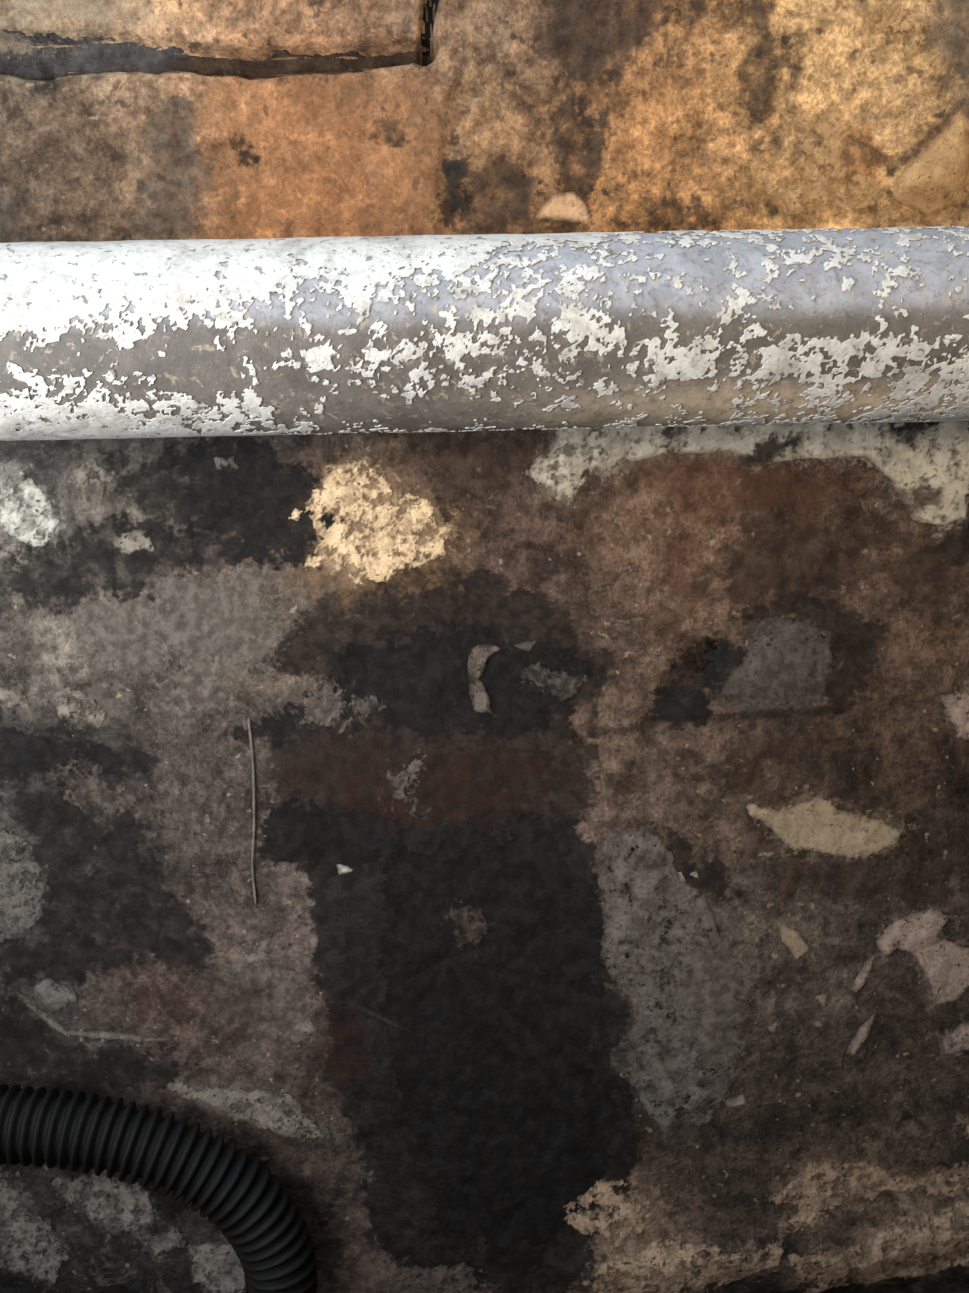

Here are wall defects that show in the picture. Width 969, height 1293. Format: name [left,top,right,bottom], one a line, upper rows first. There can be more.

spalling [864,6,924,57]
peeling [0,105,969,545]
peeling [289,459,456,593]
peeling [69,532,285,730]
water stain [646,638,749,731]
water stain [723,514,969,795]
water stain [224,554,642,1293]
water stain [650,821,743,901]
peeling [745,784,904,864]
water stain [775,1263,969,1293]